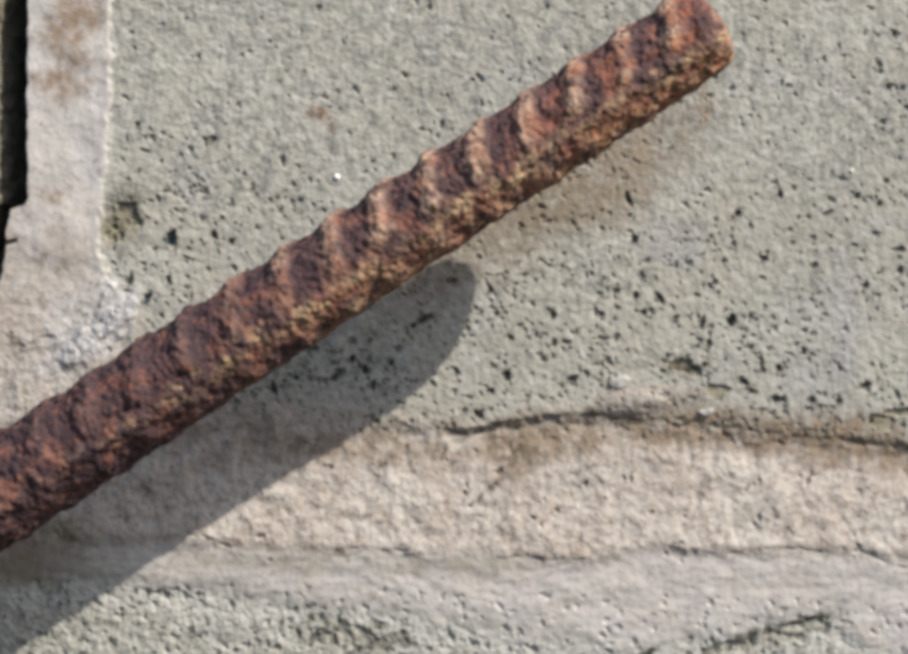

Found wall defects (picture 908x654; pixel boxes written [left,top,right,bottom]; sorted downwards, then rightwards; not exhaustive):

corrosion [51,3,97,48]
damp [484,421,599,475]
damp [625,407,908,473]